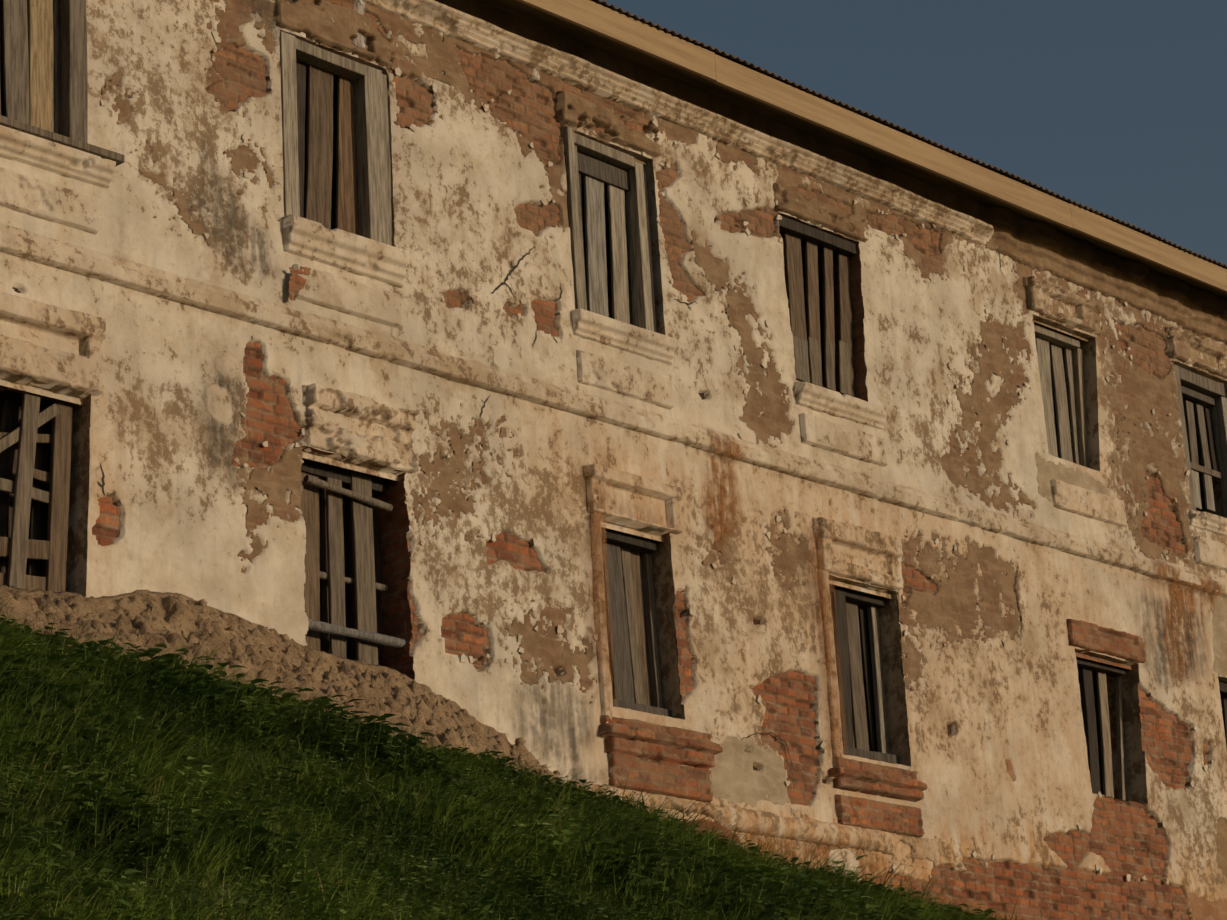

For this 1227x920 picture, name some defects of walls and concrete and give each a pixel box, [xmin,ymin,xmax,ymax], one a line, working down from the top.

flaking render [202,0,293,118]
flaking render [224,133,276,195]
crack [491,247,535,297]
flaking render [503,297,562,343]
flaking render [655,161,795,448]
flaking render [232,335,305,574]
flaking render [403,403,545,572]
flaking render [935,261,1213,564]
flaking render [897,529,1024,691]
flaking render [749,670,827,806]
flaking render [1138,686,1213,791]
flaking render [860,791,1190,920]